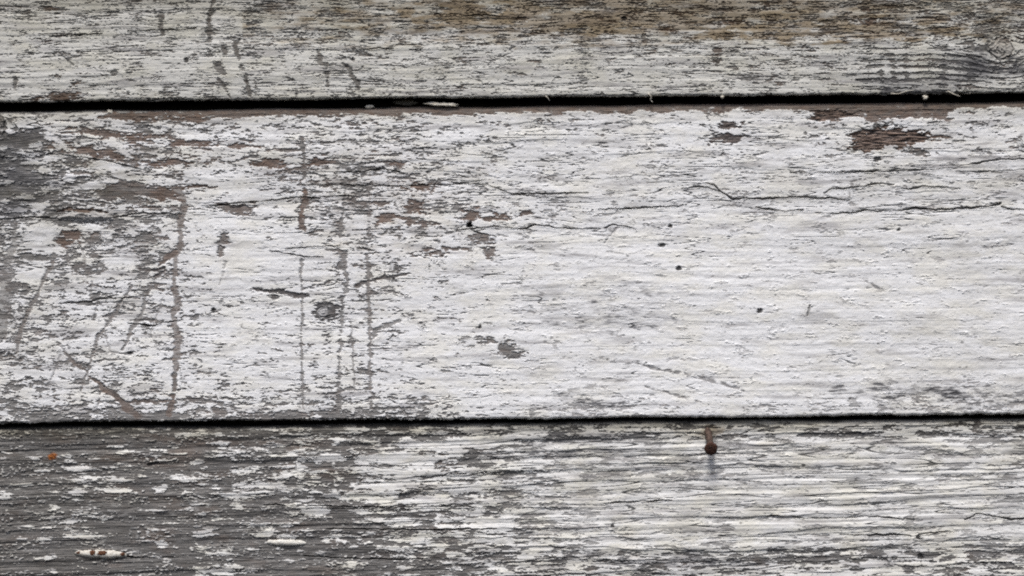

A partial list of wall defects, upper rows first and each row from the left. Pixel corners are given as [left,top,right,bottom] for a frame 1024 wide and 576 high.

peeling [156,10,167,37]
peeling [205,0,253,100]
peeling [23,80,89,103]
peeling [94,44,1024,147]
crack [0,214,52,222]
crack [110,158,1024,237]
peeling [0,123,580,576]